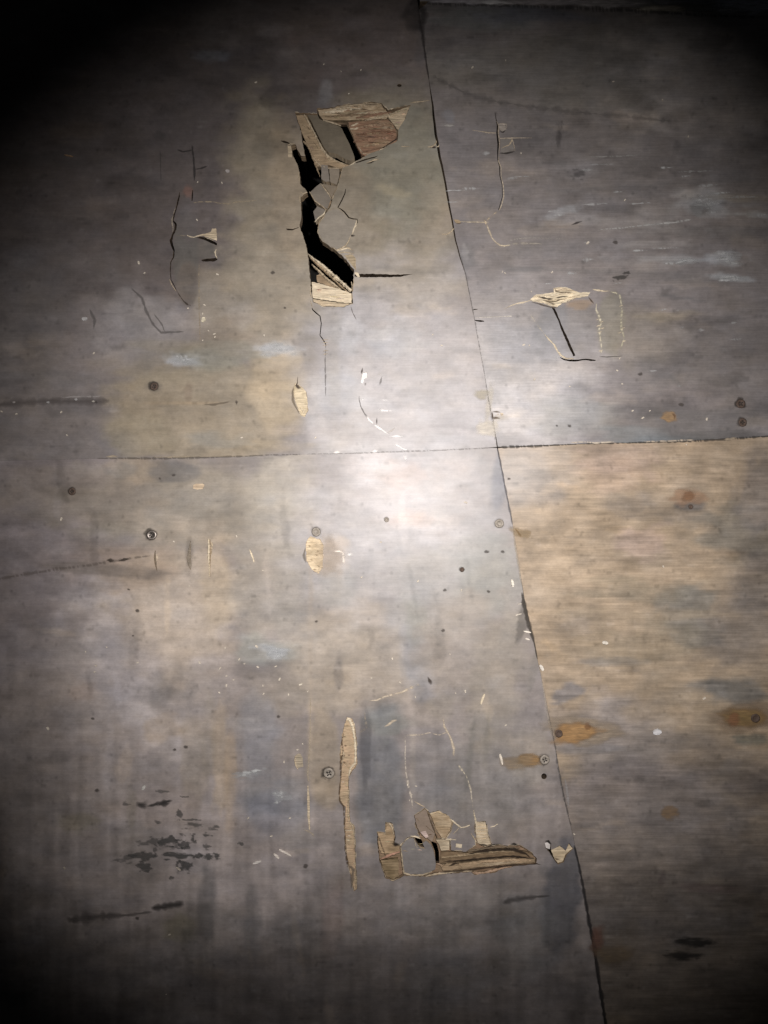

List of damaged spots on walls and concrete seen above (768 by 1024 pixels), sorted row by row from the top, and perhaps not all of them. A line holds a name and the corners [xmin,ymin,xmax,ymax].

crack [169,147,206,305]
spalling [292,378,308,417]
spalling [303,536,352,573]
spalling [339,717,358,890]
spalling [545,840,572,863]